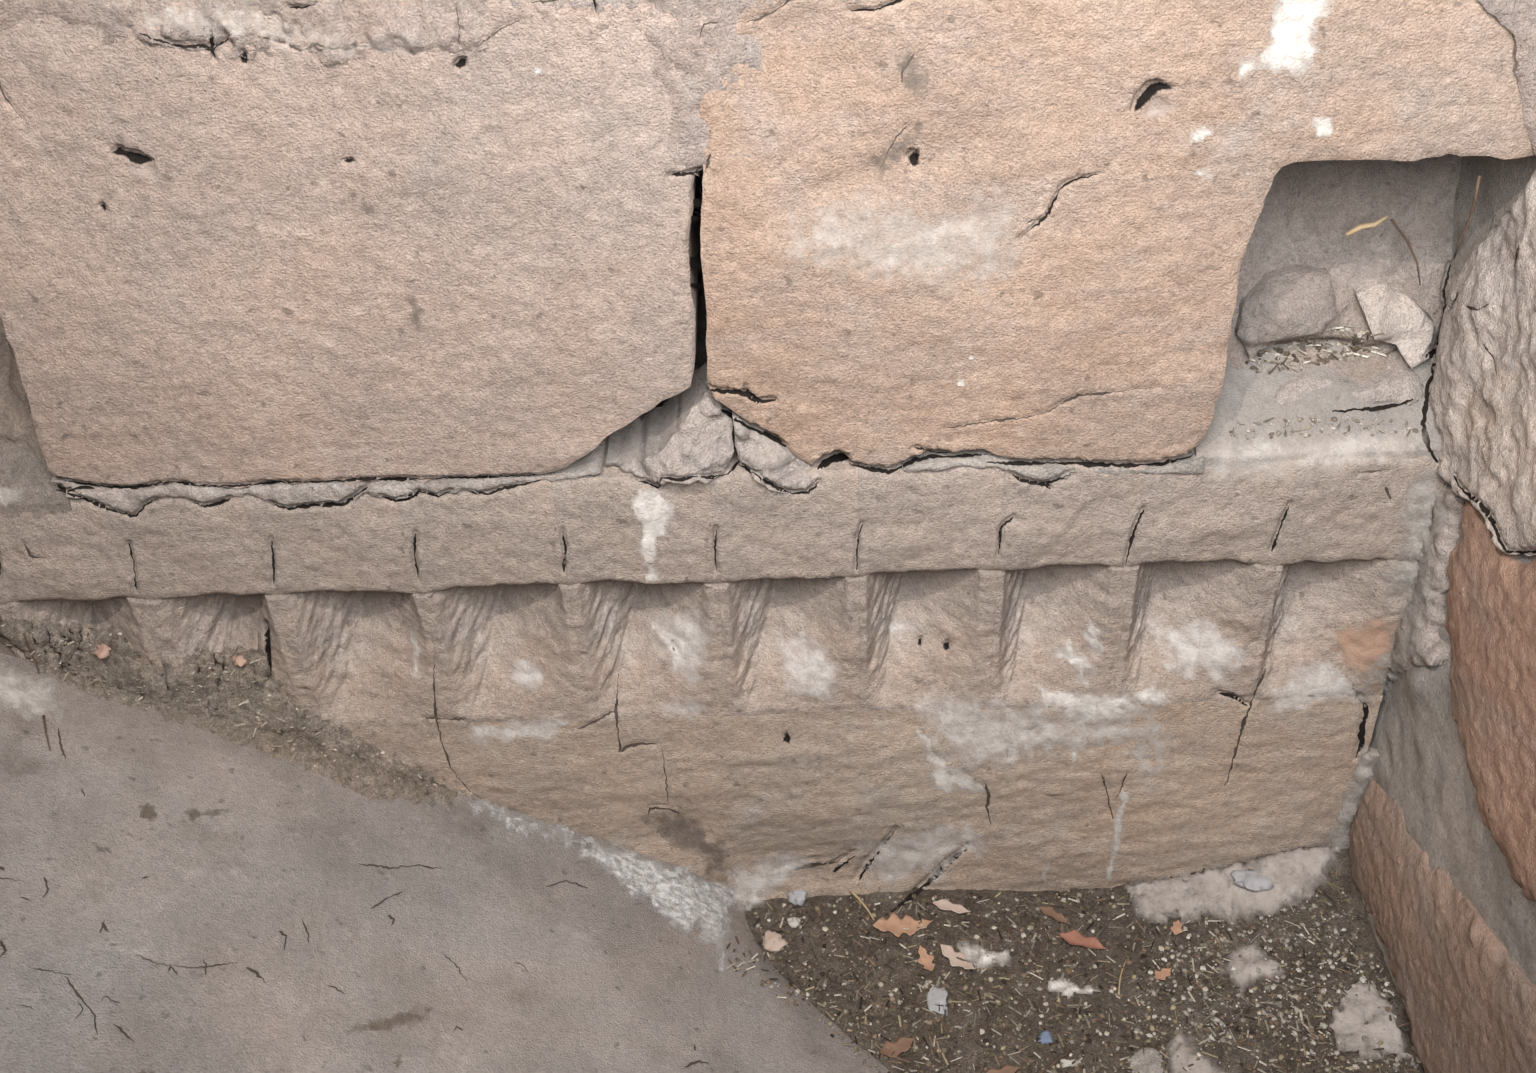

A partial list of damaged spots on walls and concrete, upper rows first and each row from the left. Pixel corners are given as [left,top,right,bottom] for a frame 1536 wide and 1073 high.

crack [699,0,791,38]
crack [851,0,903,11]
damp [1240,0,1327,75]
crack [672,153,711,328]
crack [1026,174,1098,233]
crack [637,387,1198,494]
crack [56,474,542,518]
damp [631,489,675,581]
crack [1218,668,1266,785]